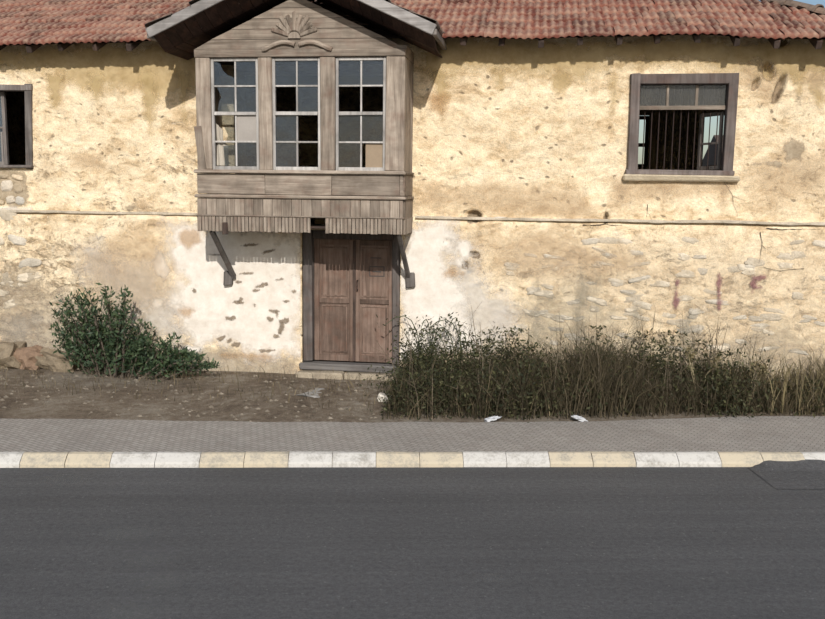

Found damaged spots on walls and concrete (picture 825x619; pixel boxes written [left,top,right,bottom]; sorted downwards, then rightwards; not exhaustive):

spalling [751,64,787,103]
flaking render [0,169,28,221]
flaking render [0,258,42,309]
peeling [86,251,179,336]
peeling [451,241,608,348]
flaking render [581,237,708,321]
flaking render [727,257,765,275]
crack [760,228,804,278]
peeling [267,309,289,338]
flaking render [705,339,747,352]